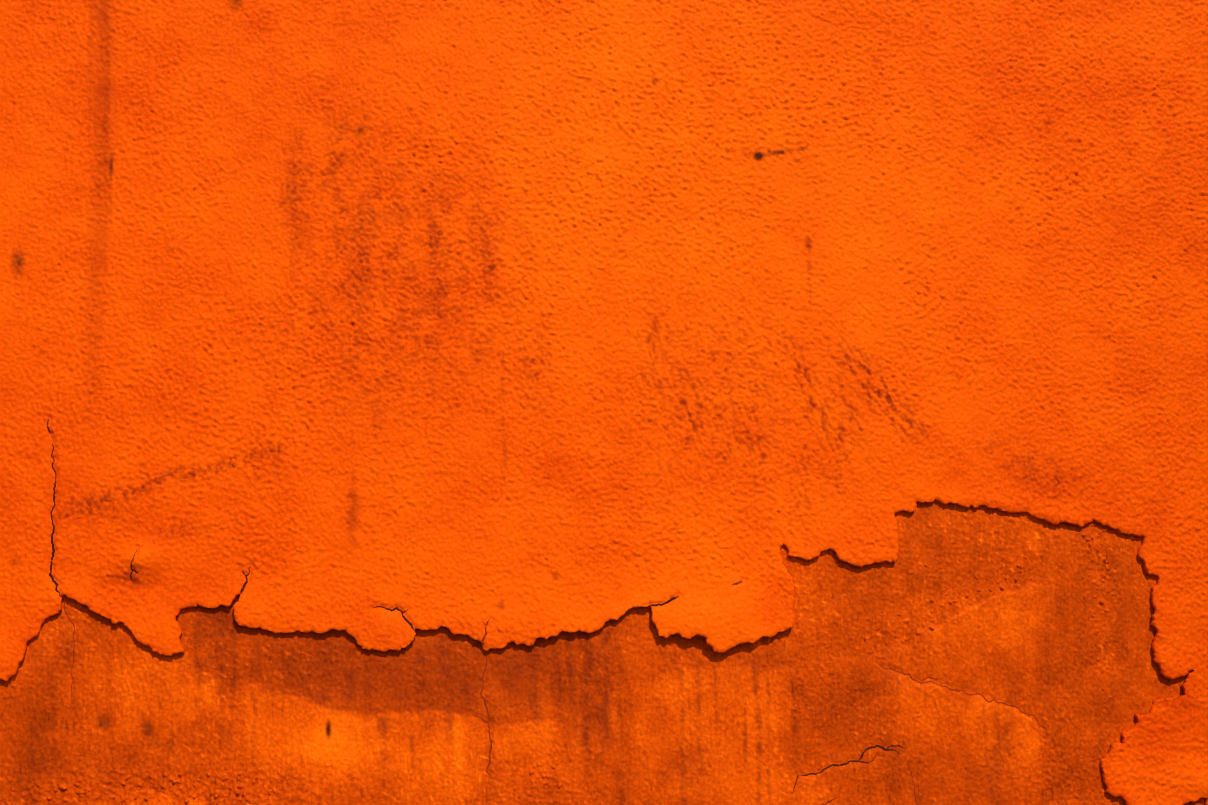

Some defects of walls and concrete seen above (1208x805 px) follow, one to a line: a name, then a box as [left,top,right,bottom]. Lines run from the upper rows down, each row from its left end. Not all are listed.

crack [47,419,75,710]
crack [240,567,250,594]
peeling [0,500,1208,805]
crack [793,744,918,805]